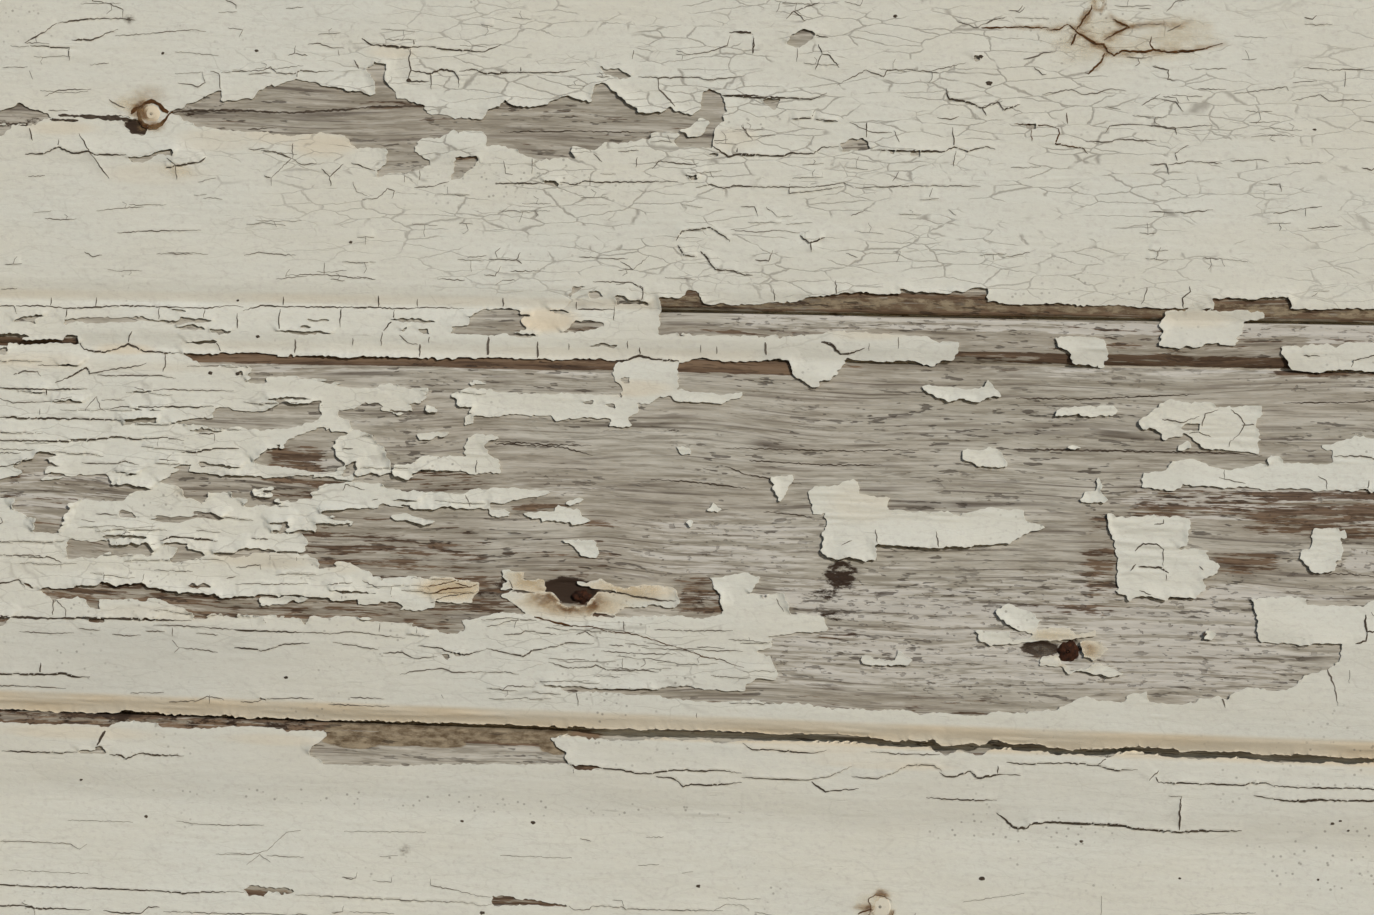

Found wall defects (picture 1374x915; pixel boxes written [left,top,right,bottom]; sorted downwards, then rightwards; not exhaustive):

rust [134,101,159,128]
peeling [171,62,727,180]
crack [0,0,1374,467]
crack [1162,410,1254,483]
peeling [0,286,1374,716]
rust [521,580,599,613]
crack [6,731,179,760]
peeling [308,728,601,770]
crack [573,743,1374,833]
crack [0,820,487,915]
crack [569,898,768,915]
crack [858,894,916,915]